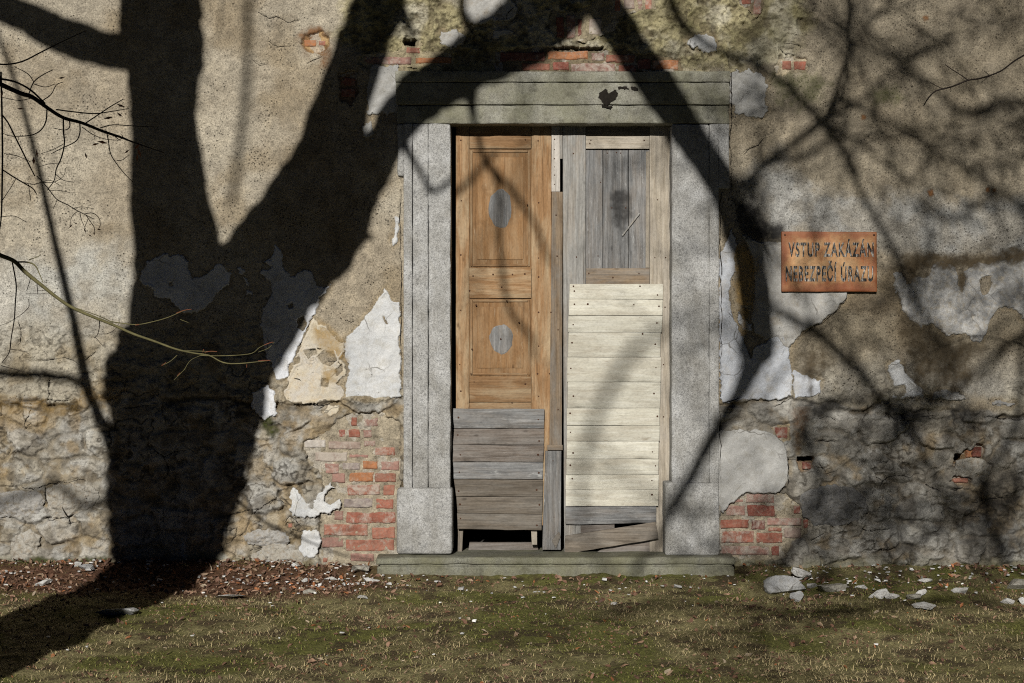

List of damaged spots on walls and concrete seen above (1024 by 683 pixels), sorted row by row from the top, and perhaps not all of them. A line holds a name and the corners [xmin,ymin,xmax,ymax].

spalling [302,31,329,55]
spalling [359,0,683,72]
spalling [774,56,808,76]
flaking render [392,216,400,245]
flaking render [719,229,847,404]
flaking render [893,260,1024,343]
spalling [251,245,402,566]
flaking render [887,360,966,401]
spalling [951,444,983,486]
spalling [719,493,809,560]